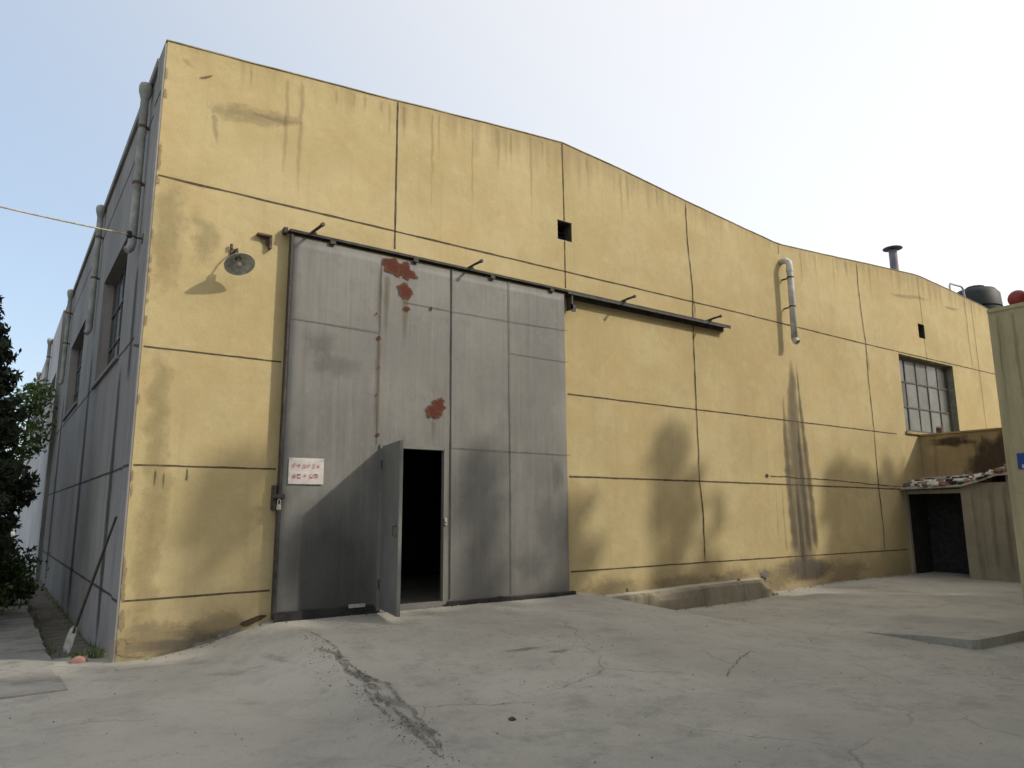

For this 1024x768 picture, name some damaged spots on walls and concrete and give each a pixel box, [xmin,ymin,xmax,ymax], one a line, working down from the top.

rust [382,258,418,311]
rust [426,398,446,419]
leakage [784,375,825,579]